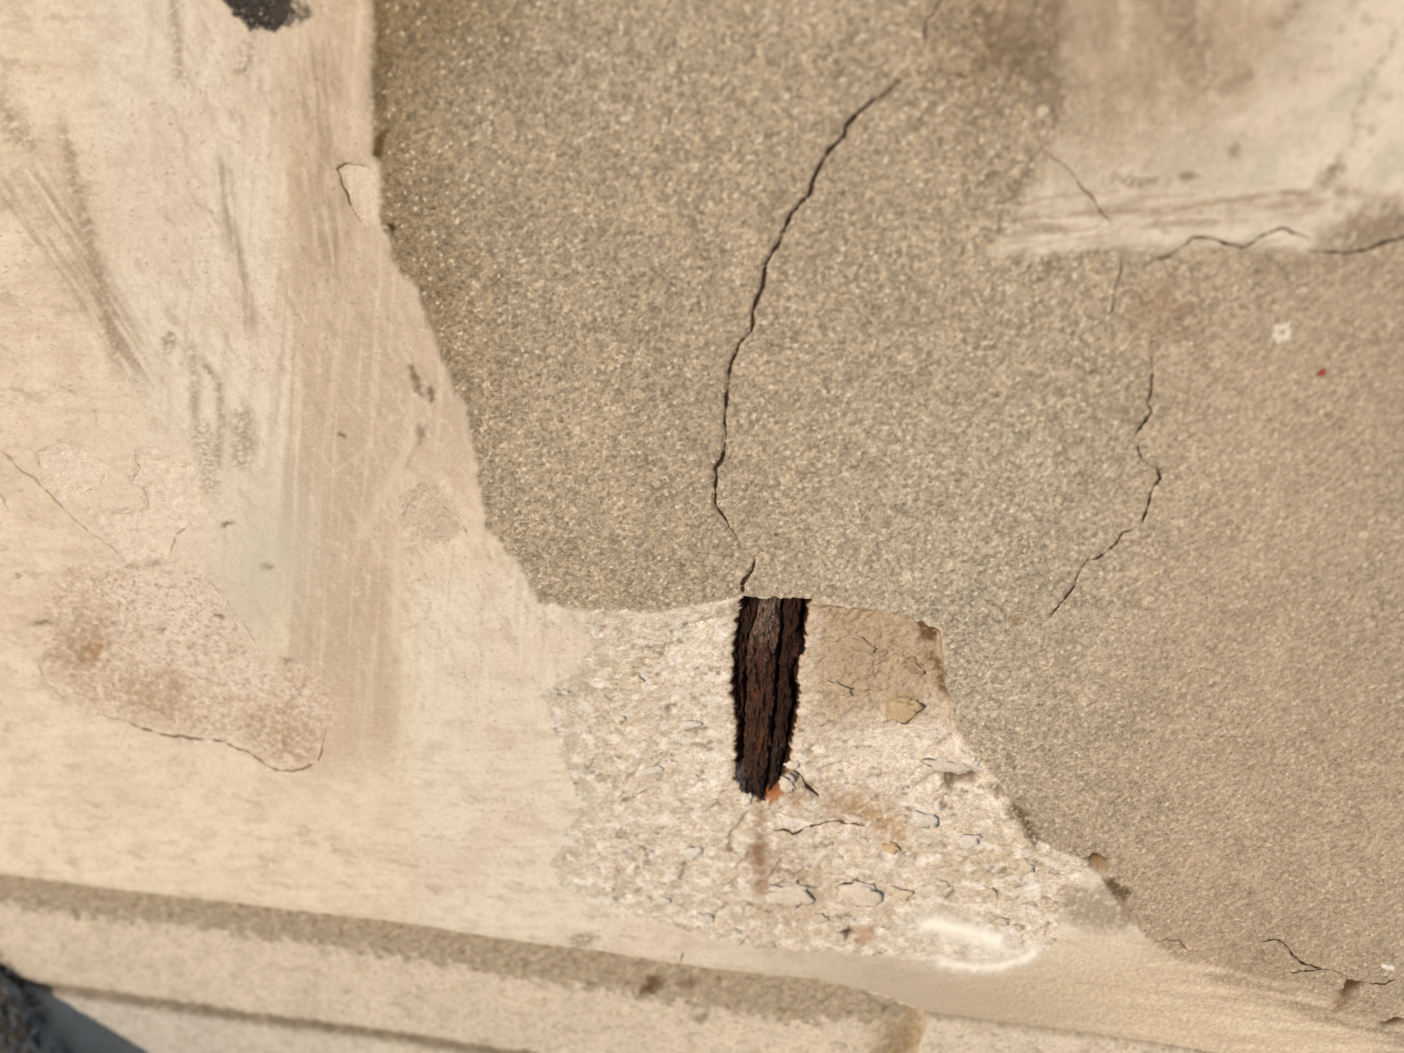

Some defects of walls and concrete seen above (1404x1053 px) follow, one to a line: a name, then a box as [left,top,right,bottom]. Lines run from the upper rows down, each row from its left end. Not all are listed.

crack [713,0,982,593]
crack [1039,146,1114,226]
crack [1111,227,1404,313]
crack [1050,337,1169,617]
flaking render [32,556,337,776]
corrosion [734,596,805,803]
flaking render [541,596,1089,963]